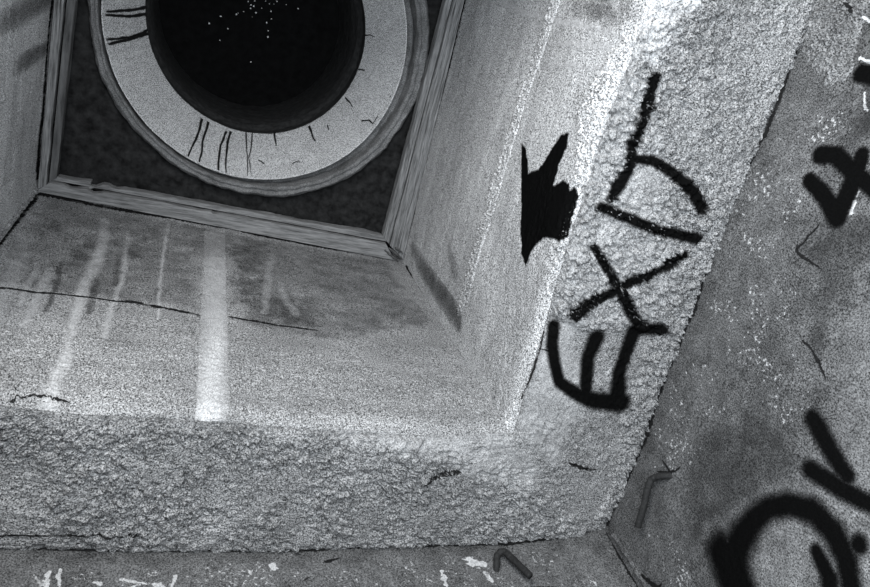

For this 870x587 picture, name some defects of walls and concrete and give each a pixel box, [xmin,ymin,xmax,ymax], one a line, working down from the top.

crack [842,2,853,14]
crack [437,0,466,114]
crack [0,0,380,258]
crack [795,223,823,270]
leakage [41,232,108,410]
crack [0,287,201,316]
leakage [196,258,227,422]
crack [228,316,319,331]
crack [7,386,71,403]